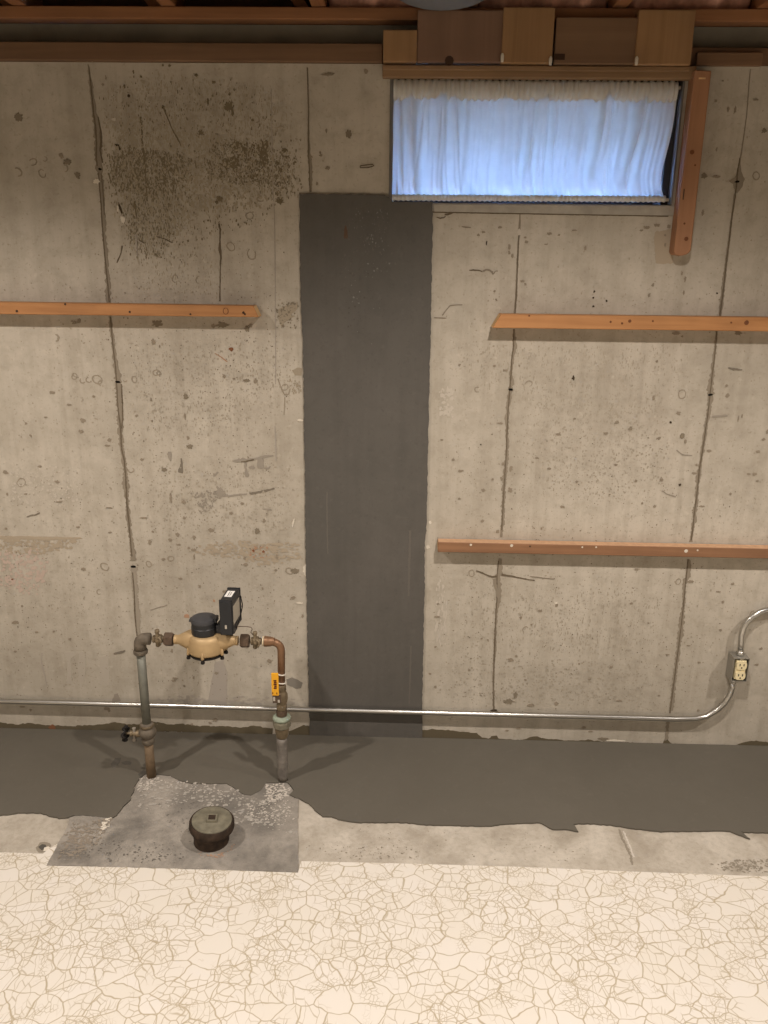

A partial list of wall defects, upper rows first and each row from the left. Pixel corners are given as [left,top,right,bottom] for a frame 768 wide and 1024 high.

crack [88,66,173,636]
damp [93,72,302,303]
crack [433,211,668,530]
crack [669,158,740,713]